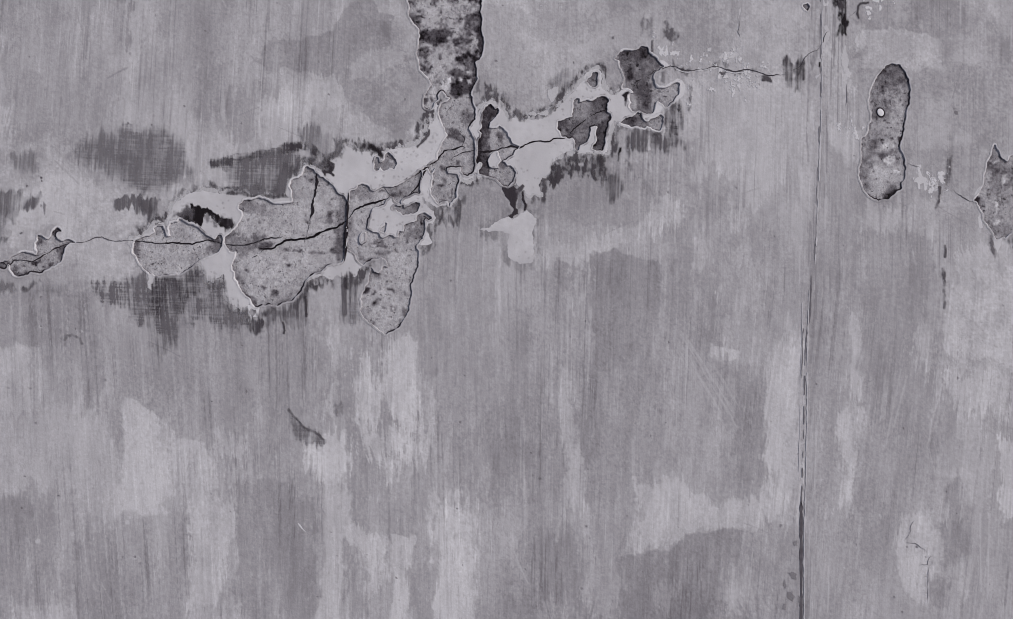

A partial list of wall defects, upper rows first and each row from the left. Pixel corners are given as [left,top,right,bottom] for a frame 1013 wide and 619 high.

spalling [0,225,76,279]
spalling [127,0,685,336]
crack [1,32,827,266]
spalling [857,62,944,203]
spalling [972,143,1013,253]